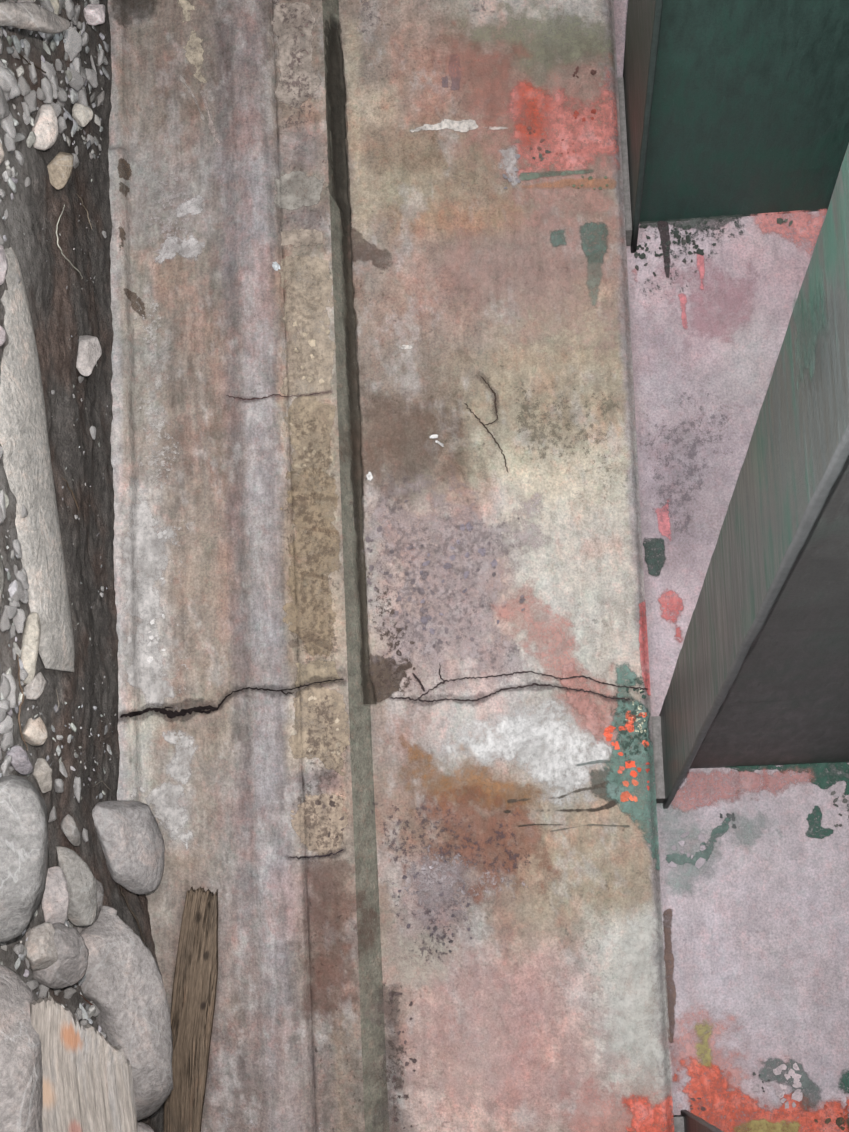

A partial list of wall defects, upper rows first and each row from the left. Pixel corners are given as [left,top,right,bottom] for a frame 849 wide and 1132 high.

crack [464,376,508,472]
crack [120,679,344,718]
crack [391,664,647,702]
peeling [561,591,736,870]
corrosion [409,746,529,811]
peeling [672,762,849,839]
peeling [623,1057,849,1132]